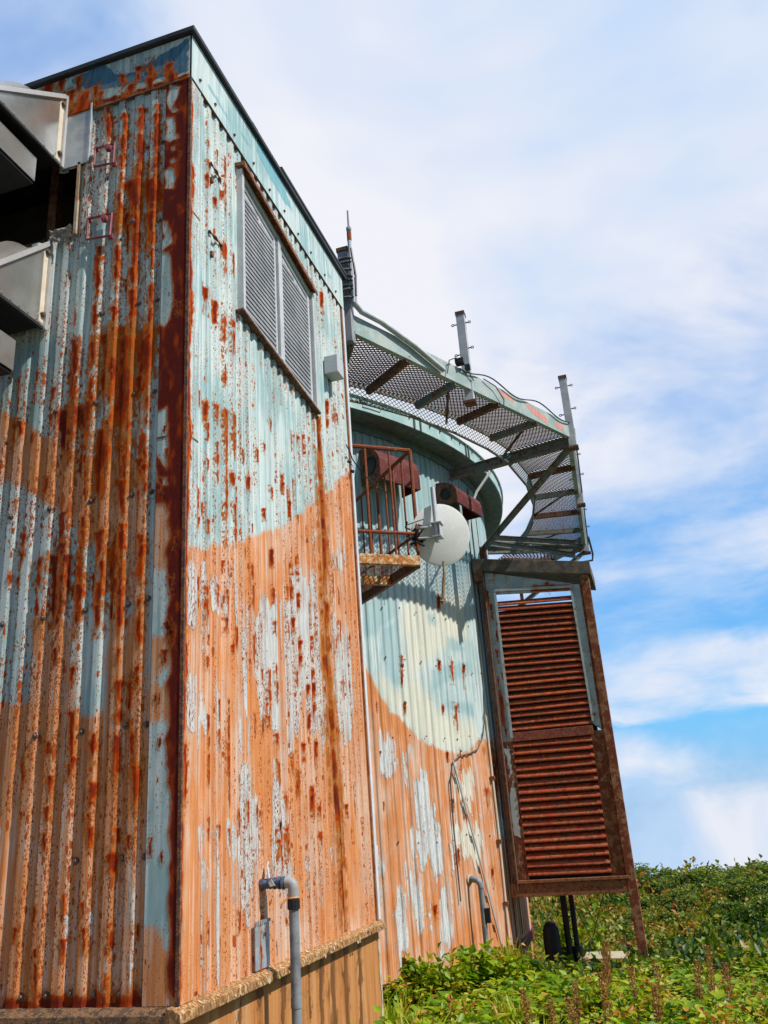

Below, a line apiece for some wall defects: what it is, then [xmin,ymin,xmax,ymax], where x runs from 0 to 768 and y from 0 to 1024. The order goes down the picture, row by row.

rust [2,57,363,1009]
peeling [186,525,353,1004]
peeling [357,726,509,1021]
rust [483,743,501,810]